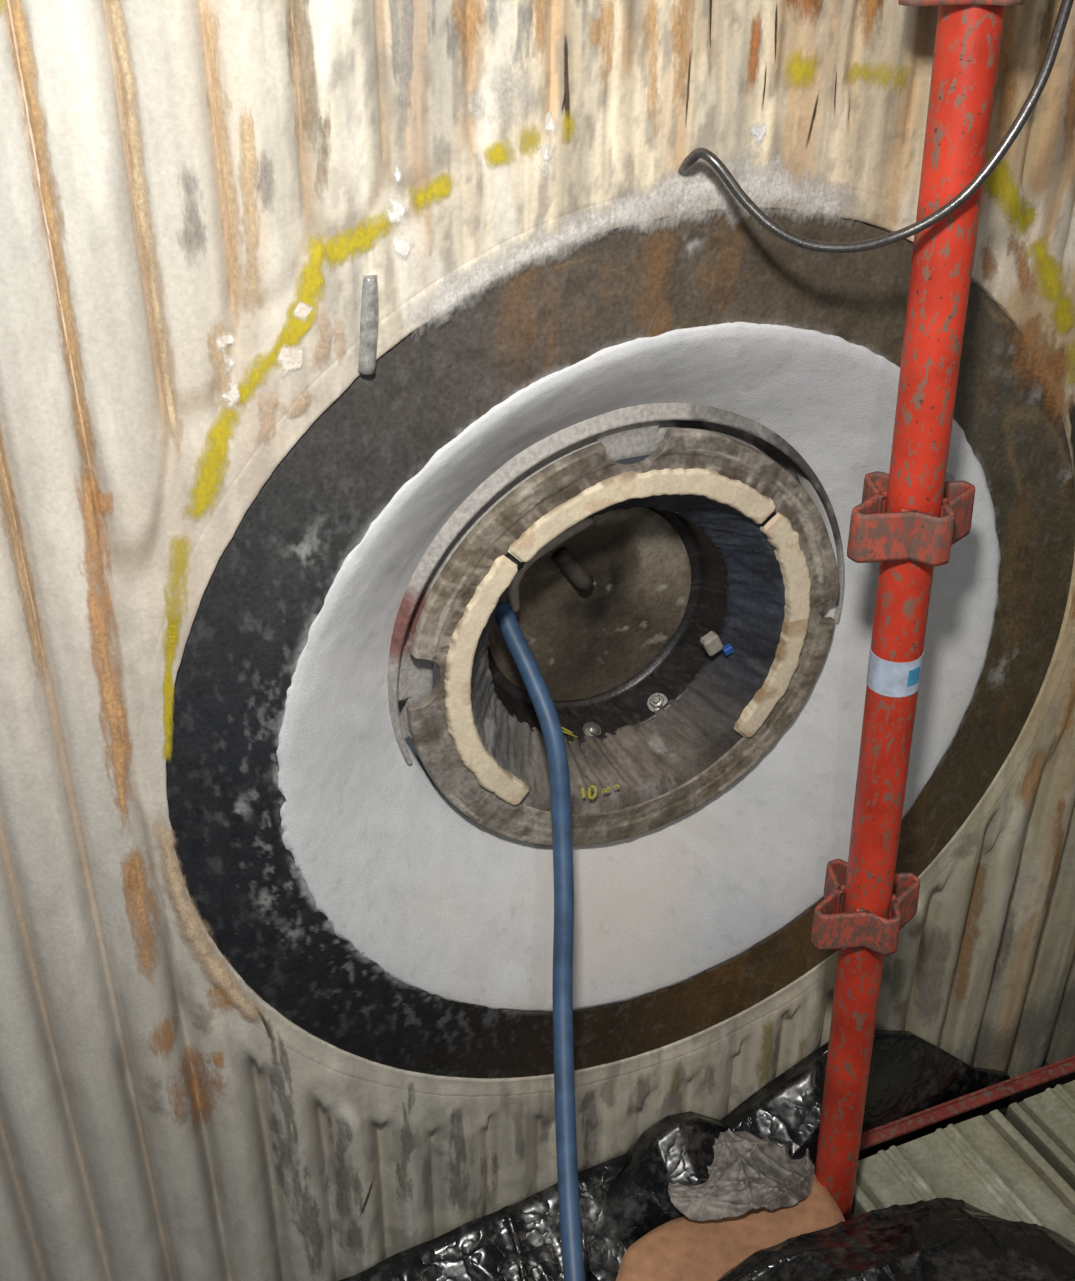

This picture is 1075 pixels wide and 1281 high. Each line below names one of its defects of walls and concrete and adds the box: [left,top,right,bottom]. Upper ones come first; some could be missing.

corrosion [749,21,761,82]
corrosion [1010,240,1029,289]
corrosion [1012,317,1073,416]
corrosion [124,853,156,974]
corrosion [957,866,983,997]
corrosion [1031,804,1064,975]
water stain [267,1024,322,1270]
water stain [329,1119,362,1248]
water stain [397,1089,412,1190]
water stain [451,1112,467,1206]